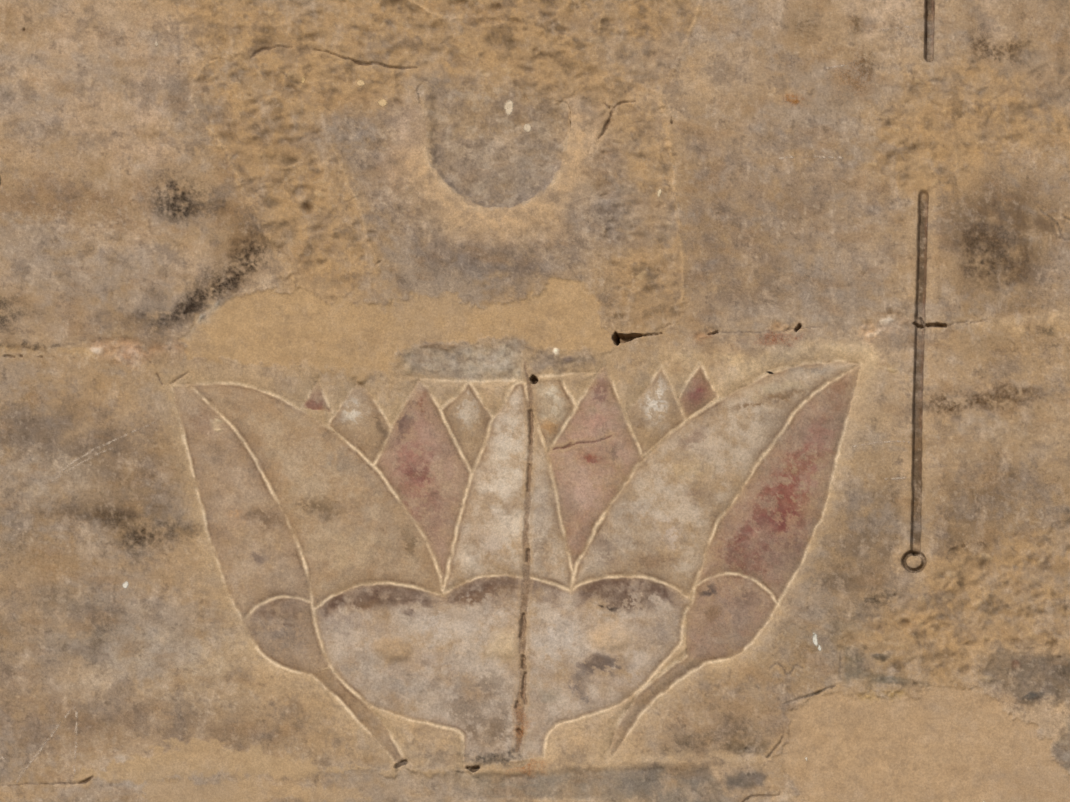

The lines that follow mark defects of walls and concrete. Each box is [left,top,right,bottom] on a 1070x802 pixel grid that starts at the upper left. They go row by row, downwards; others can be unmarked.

crack [251,45,419,70]
spalling [138,0,699,335]
crack [613,333,662,346]
crack [709,324,824,336]
crack [914,318,988,330]
crack [514,363,613,754]